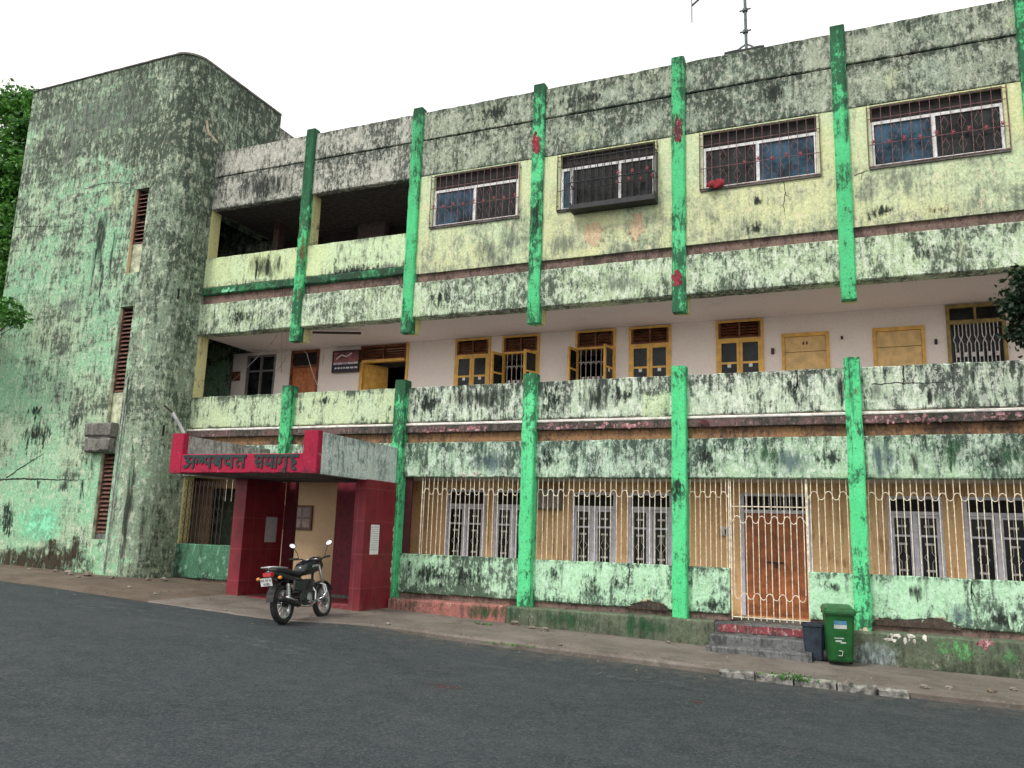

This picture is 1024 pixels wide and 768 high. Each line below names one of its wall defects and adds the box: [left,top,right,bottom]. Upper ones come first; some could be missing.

water stain [239,175,289,199]
water stain [90,215,115,296]
water stain [250,255,280,279]
crack [872,366,944,395]
water stain [21,406,53,455]
peeling [863,414,949,425]
water stain [690,450,714,475]
water stain [0,502,93,573]
spalling [859,616,961,644]
water stain [990,608,1018,628]